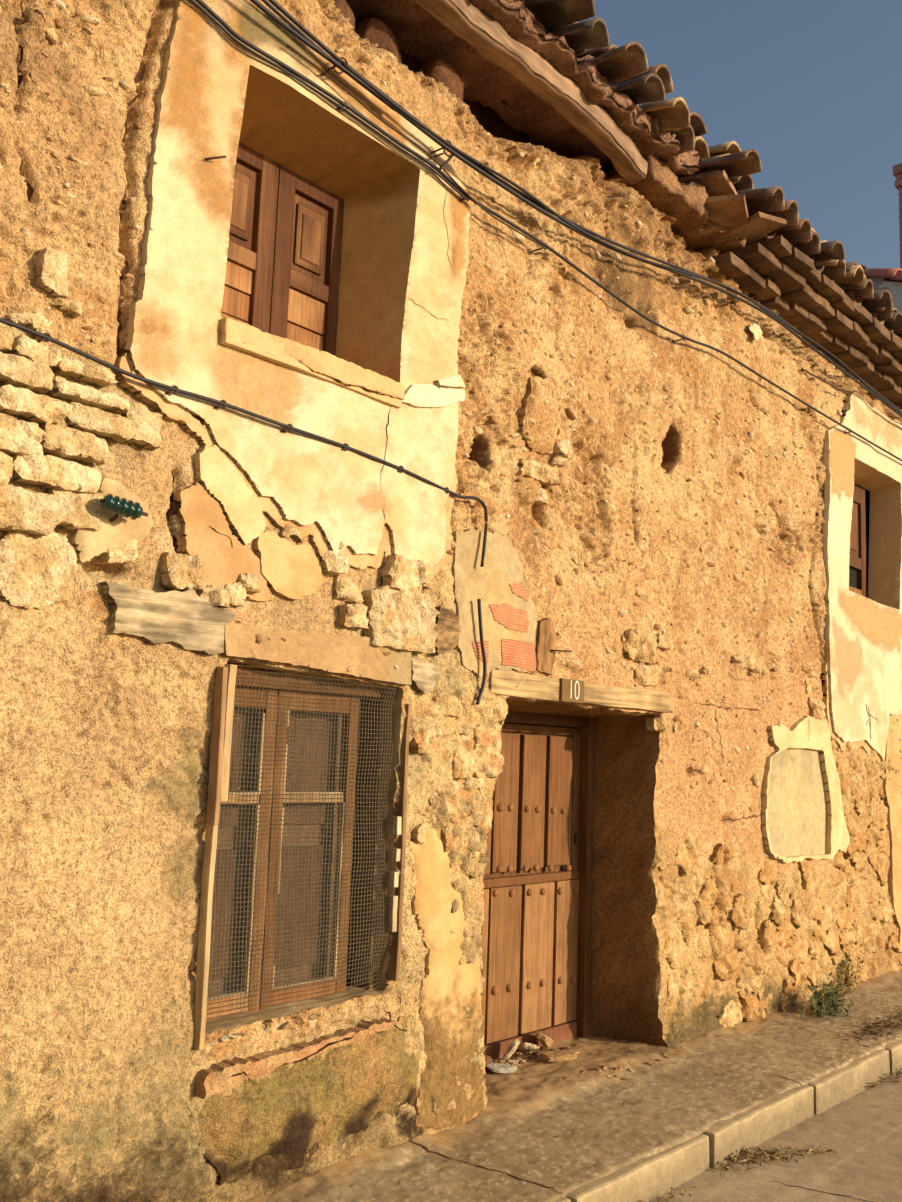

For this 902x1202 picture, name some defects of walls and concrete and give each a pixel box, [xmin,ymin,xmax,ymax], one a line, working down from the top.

crack [14,0,48,111]
crack [122,10,157,147]
crack [19,159,34,202]
crack [116,188,132,372]
spalling [0,247,163,609]
flaking render [160,444,440,654]
spalling [400,684,508,1129]
damp [0,1142,204,1202]
damp [246,1142,319,1193]
crack [773,1181,871,1202]